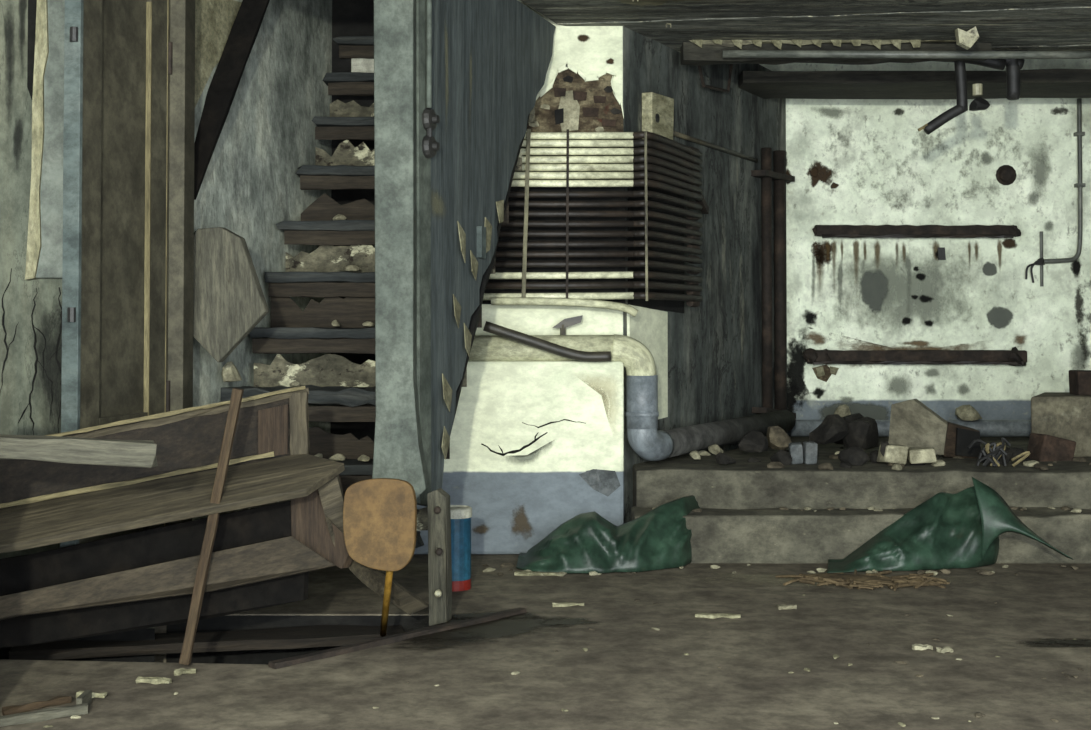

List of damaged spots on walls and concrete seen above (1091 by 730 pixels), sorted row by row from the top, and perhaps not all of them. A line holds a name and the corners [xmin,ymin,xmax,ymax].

flaking render [526,62,624,132]
corrosion [811,241,880,279]
damp [838,258,962,323]
corrosion [997,238,1016,263]
damp [1071,259,1091,368]
crack [0,268,62,435]
damp [787,310,888,420]
damp [890,378,906,393]